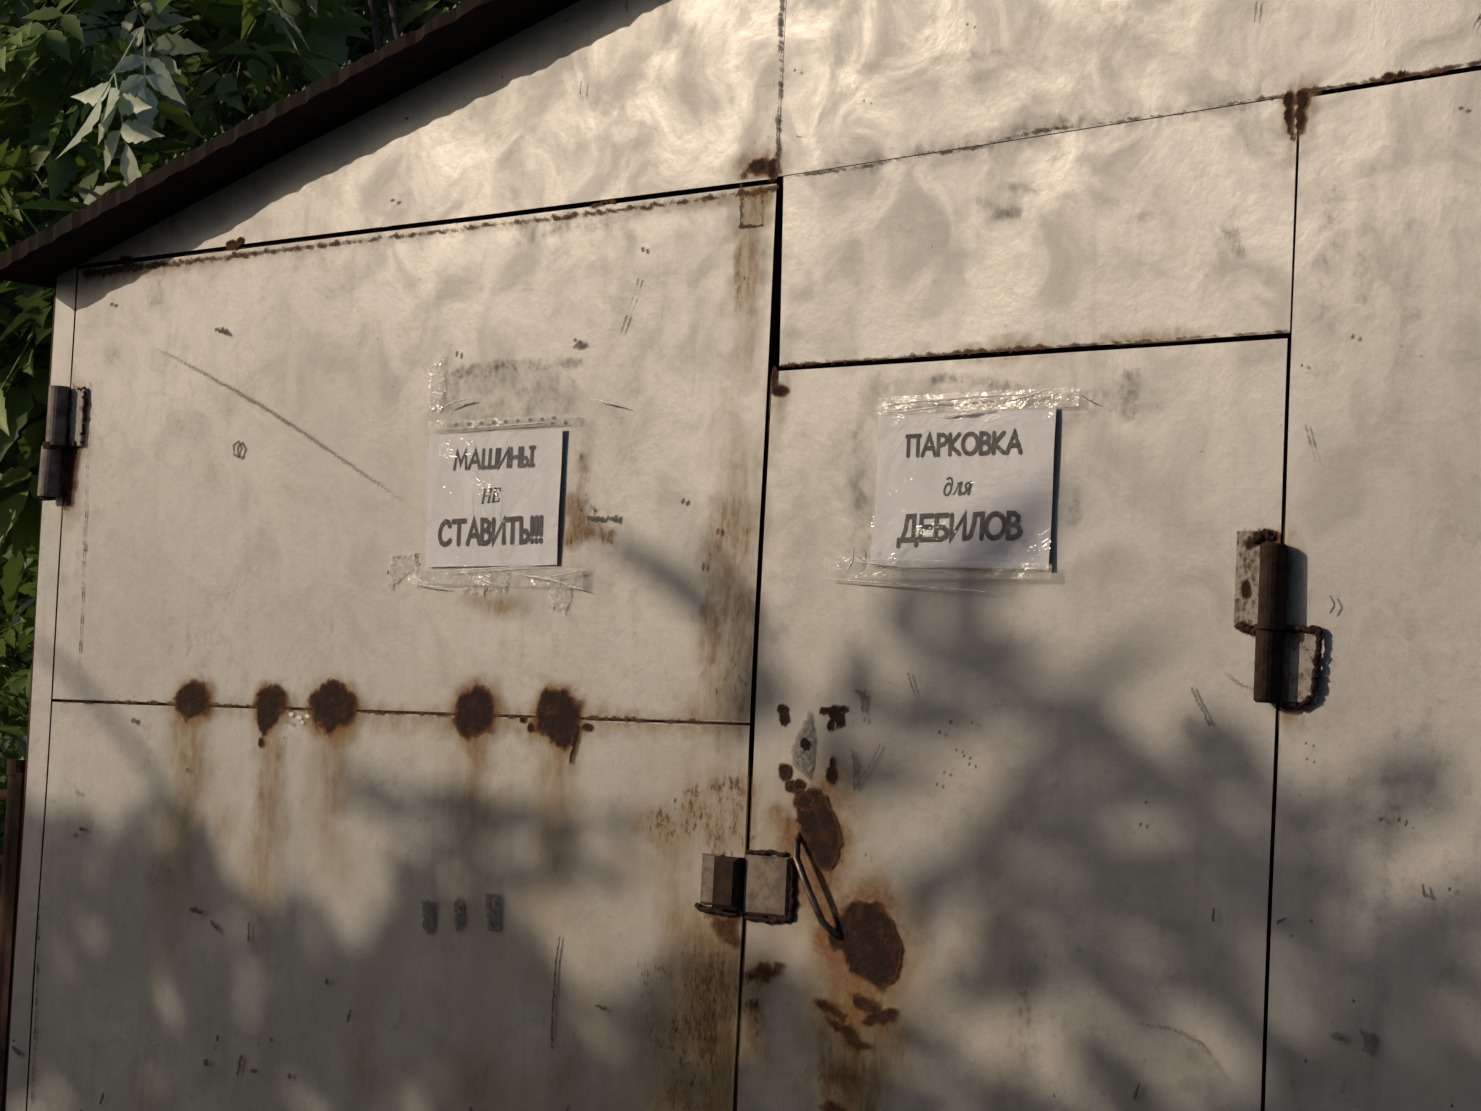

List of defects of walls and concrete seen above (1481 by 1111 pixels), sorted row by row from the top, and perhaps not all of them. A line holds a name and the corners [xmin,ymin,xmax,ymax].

rust [1283,60,1481,141]
rust [62,383,91,653]
rust [567,496,612,544]
rust [1235,528,1291,636]
rust [63,678,743,789]
rust [777,703,788,726]
rust [819,705,847,732]
rust [647,777,754,856]
rust [772,756,907,1111]
rust [651,914,782,1111]